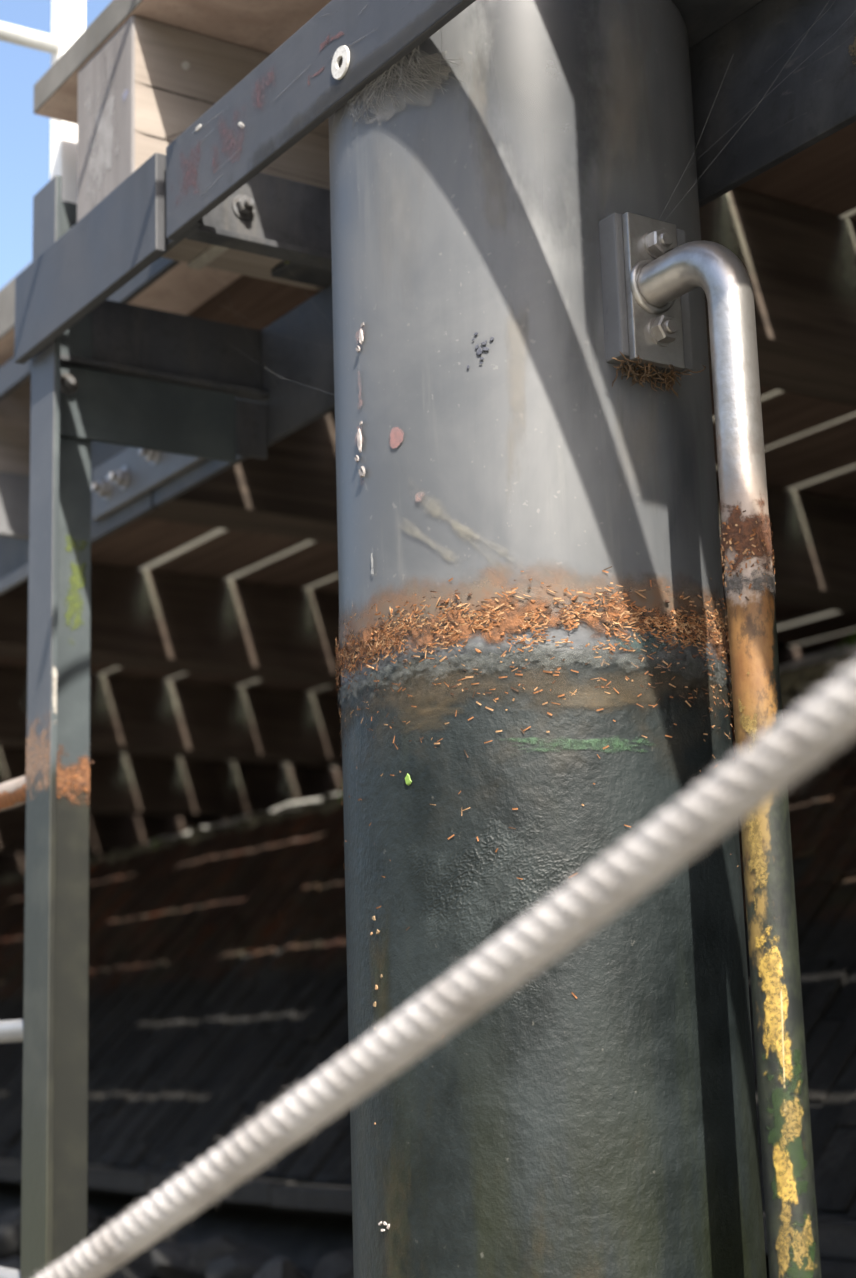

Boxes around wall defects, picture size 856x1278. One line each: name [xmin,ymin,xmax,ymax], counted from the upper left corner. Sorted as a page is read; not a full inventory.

rust [335,498,776,755]
rust [0,720,94,809]
peeling [745,811,769,910]
peeling [755,927,817,1278]